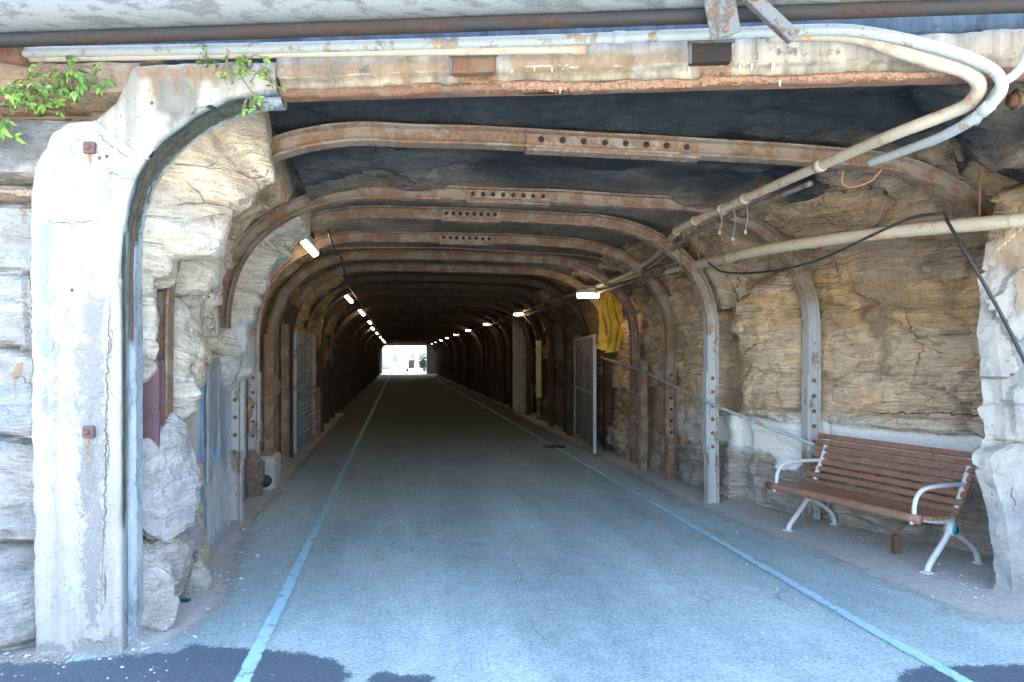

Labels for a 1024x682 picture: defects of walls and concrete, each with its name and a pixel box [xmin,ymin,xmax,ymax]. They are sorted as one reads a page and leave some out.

crack [80,265,116,651]
crack [838,297,980,417]